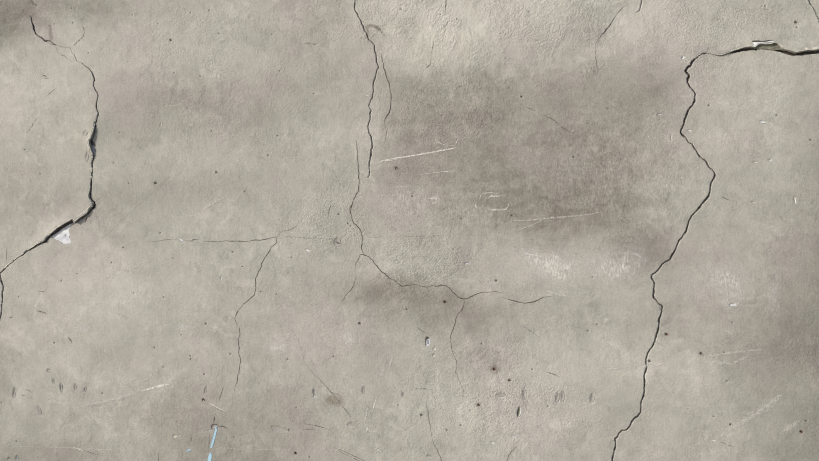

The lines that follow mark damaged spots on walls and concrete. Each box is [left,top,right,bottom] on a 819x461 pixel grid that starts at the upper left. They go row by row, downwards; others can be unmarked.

crack [0,236,50,318]
spalling [49,221,75,244]
crack [31,18,101,222]
crack [193,224,302,399]
crack [328,0,551,377]
crack [612,53,715,461]